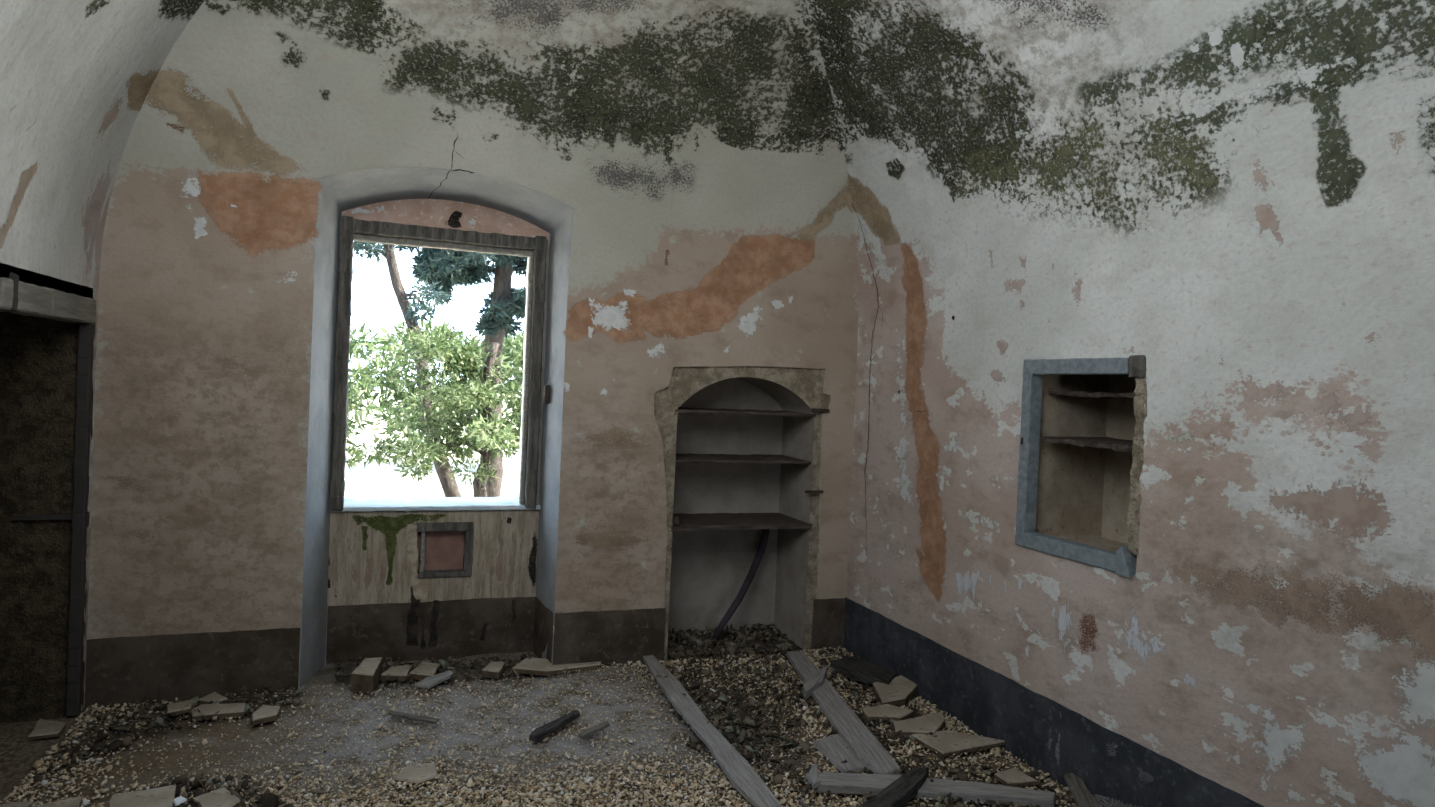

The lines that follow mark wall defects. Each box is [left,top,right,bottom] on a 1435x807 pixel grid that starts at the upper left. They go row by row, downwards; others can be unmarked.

water stain [86,0,109,17]
water stain [125,66,322,258]
peeling [180,174,208,240]
peeling [587,287,636,339]
peeling [723,295,793,353]
water stain [158,0,1435,602]
peeling [1219,355,1286,403]
peeling [1266,475,1396,547]
water stain [406,587,440,649]
water stain [1162,558,1435,665]
peeling [1239,703,1308,802]
peeling [1353,652,1435,807]